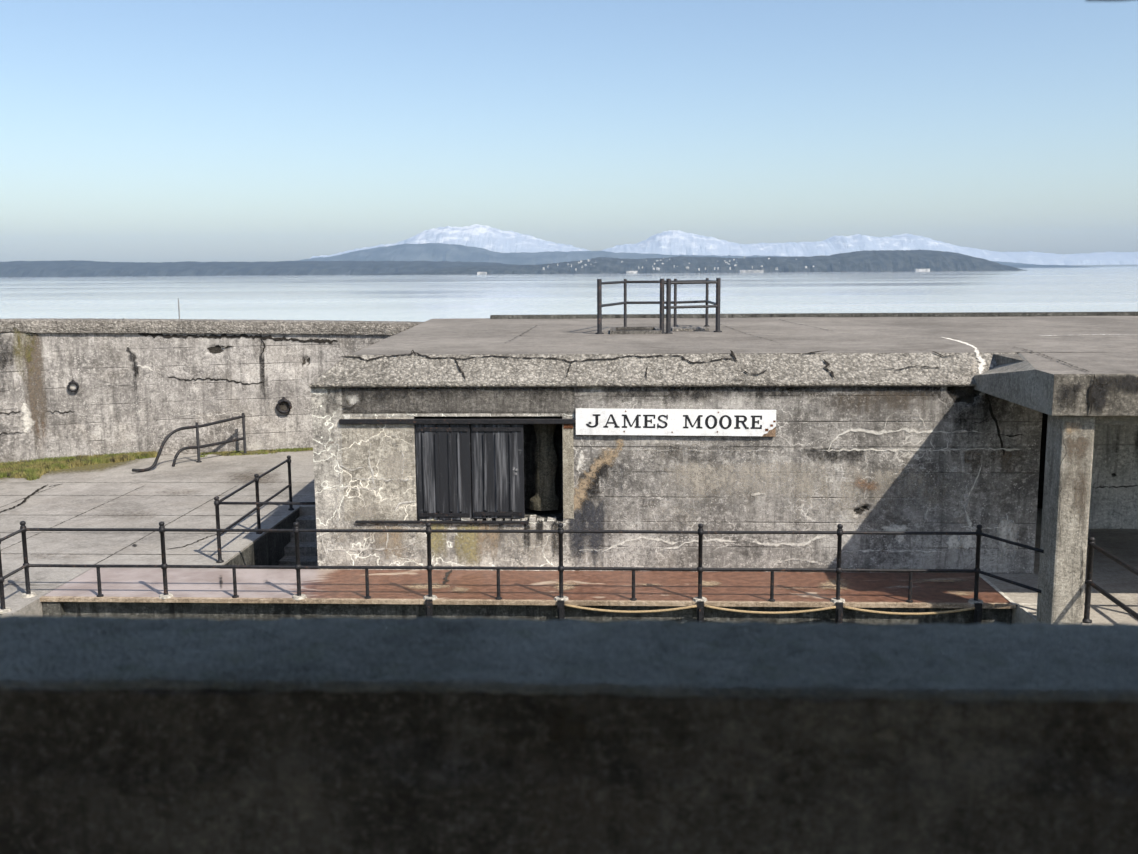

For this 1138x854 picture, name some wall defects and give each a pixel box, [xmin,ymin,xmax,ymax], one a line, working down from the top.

leakage [0,332,46,438]
crack [137,365,263,385]
crack [122,318,766,380]
crack [799,324,834,377]
crack [881,351,952,370]
crack [0,410,75,435]
crack [972,393,1023,454]
leakage [524,457,735,561]